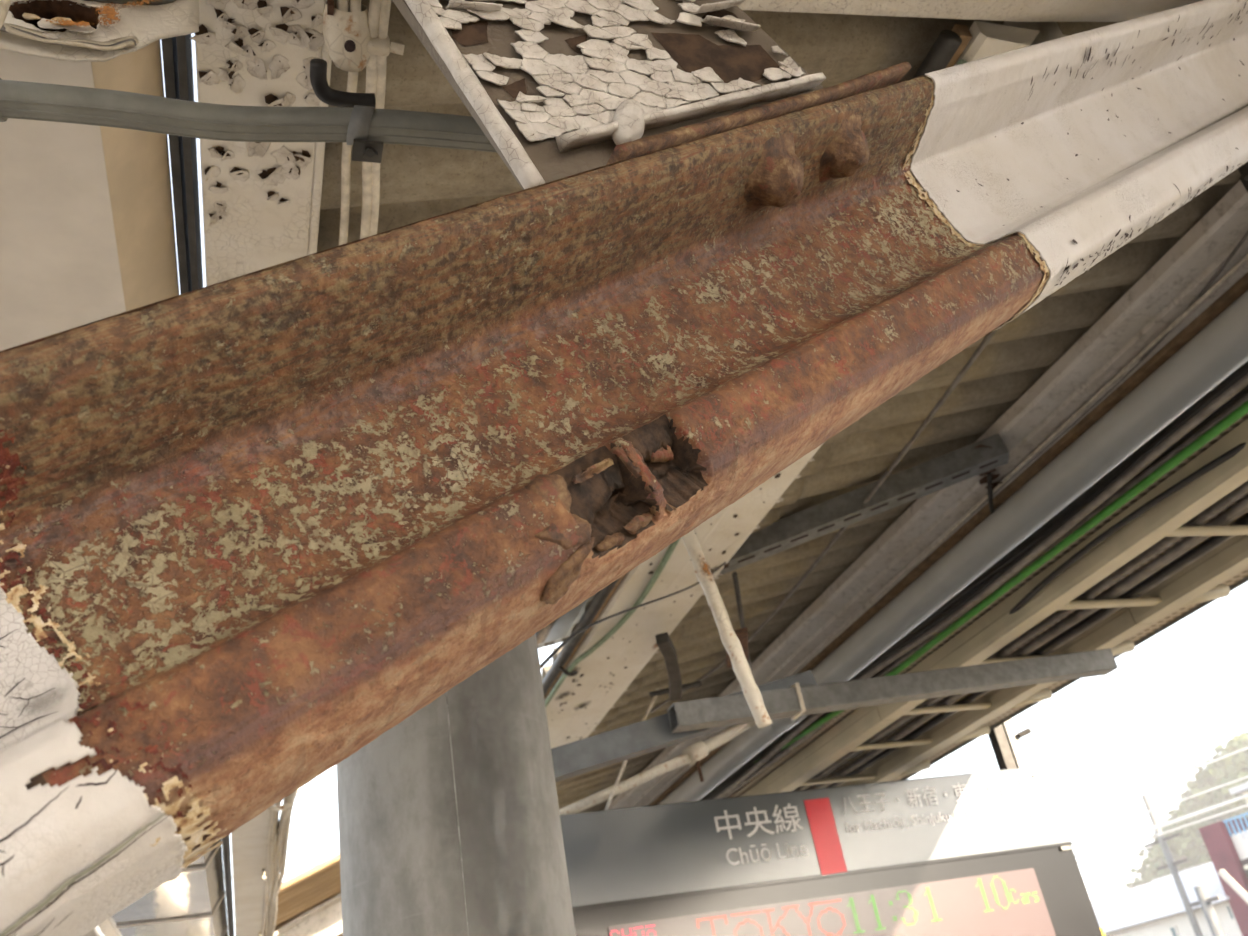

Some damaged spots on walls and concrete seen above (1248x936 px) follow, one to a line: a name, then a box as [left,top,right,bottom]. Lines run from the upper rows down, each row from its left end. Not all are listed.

peeling [451,9,630,73]
peeling [502,58,582,104]
peeling [651,2,780,83]
peeling [204,142,312,226]
corrosion [0,76,1048,864]
spalling [524,445,674,605]
crack [0,678,58,739]
peeling [25,774,47,790]
crack [0,769,118,876]
crack [0,813,167,936]